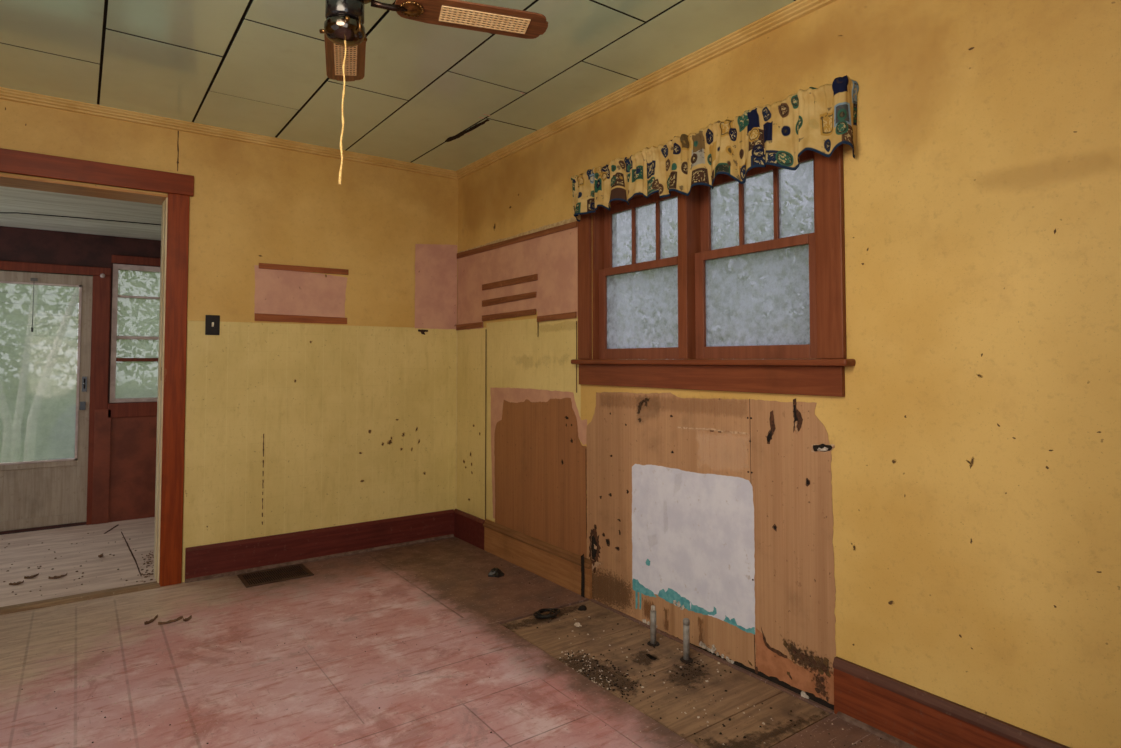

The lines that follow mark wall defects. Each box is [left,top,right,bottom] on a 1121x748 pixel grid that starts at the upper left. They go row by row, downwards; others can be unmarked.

crack [174,131,182,171]
peeling [473,387,836,702]
damp [783,639,834,698]